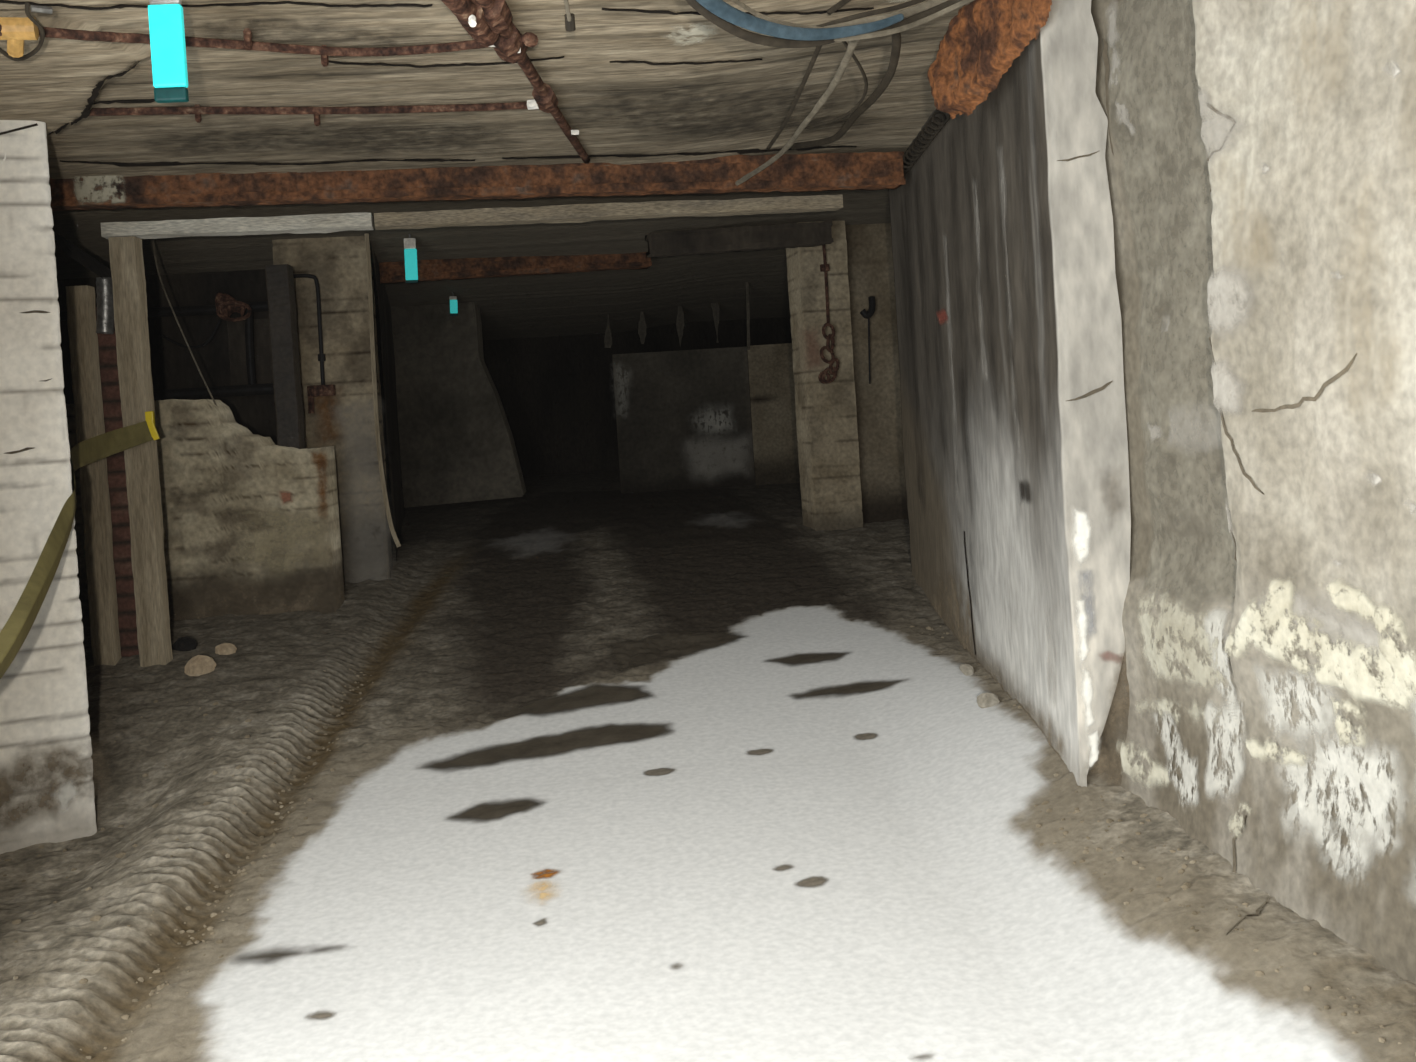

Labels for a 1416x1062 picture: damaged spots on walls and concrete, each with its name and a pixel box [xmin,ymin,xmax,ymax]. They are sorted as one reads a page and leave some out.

crack [0,0,432,10]
crack [602,7,701,15]
crack [745,7,874,15]
crack [329,56,564,68]
crack [610,57,762,65]
crack [49,61,857,167]
crack [1207,103,1236,192]
crack [1219,353,1357,495]
peeling [1116,741,1169,787]
peeling [1246,740,1306,765]
peeling [1229,805,1250,837]